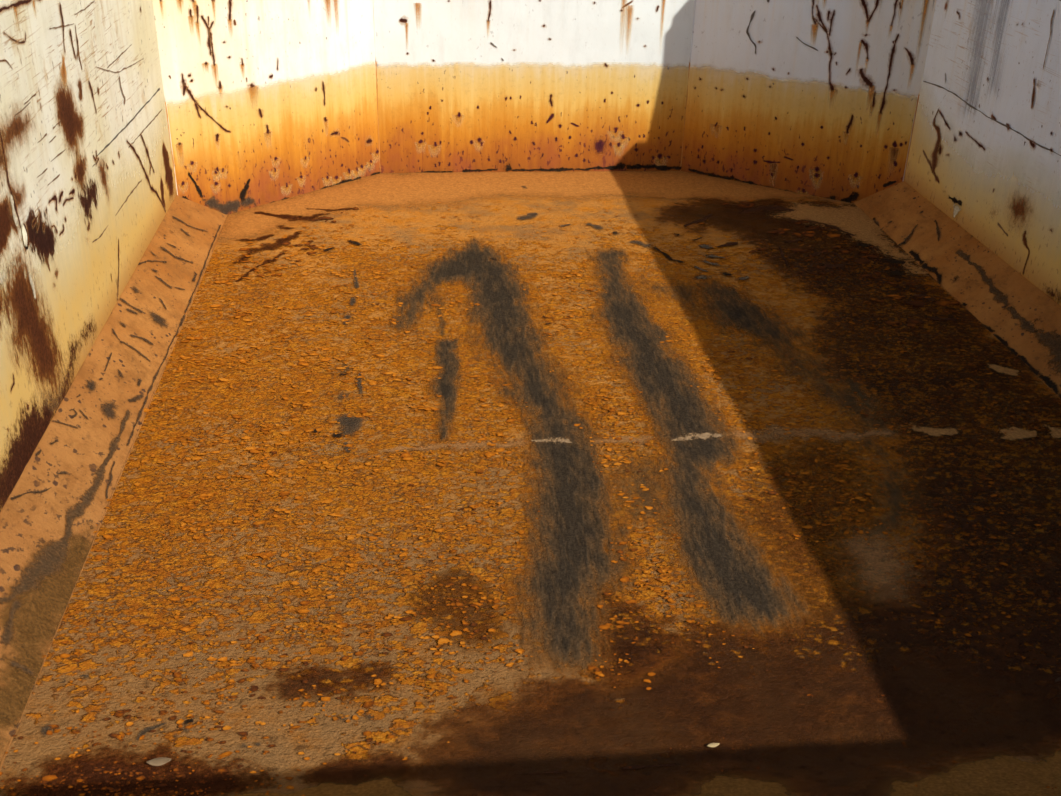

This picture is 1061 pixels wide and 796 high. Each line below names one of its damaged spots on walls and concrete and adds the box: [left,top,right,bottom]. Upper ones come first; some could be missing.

rust [0,52,1061,512]
water stain [0,410,130,746]
water stain [3,744,275,796]
rust [266,661,397,700]
rust [412,570,501,643]
water stain [299,197,1061,796]